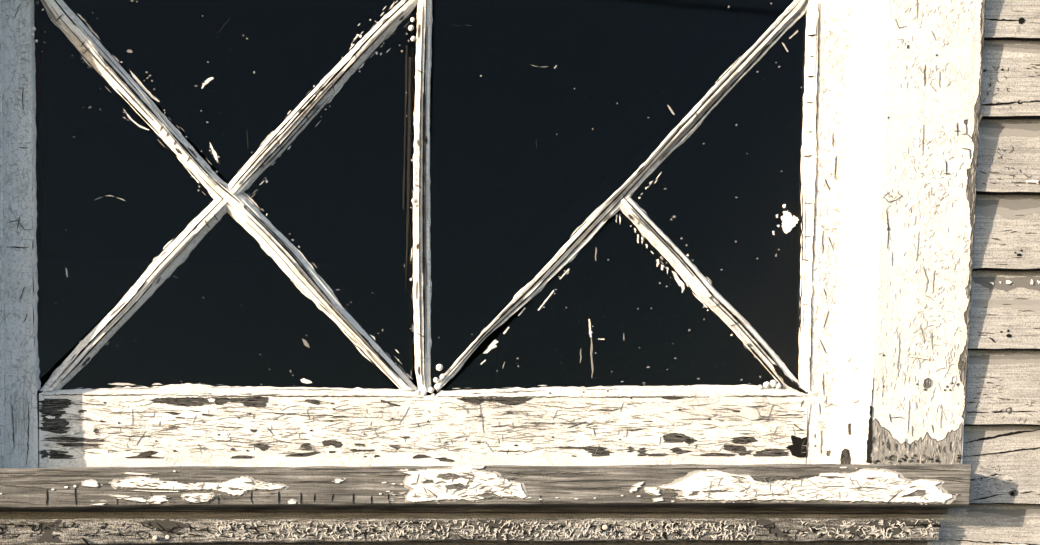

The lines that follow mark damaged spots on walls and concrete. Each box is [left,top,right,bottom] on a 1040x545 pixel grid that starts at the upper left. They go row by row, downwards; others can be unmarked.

crack [6,0,972,464]
peeling [498,162,649,317]
peeling [621,0,1039,505]
peeling [458,391,531,414]
peeling [286,430,380,457]
crack [115,481,277,503]
peeling [379,455,542,504]
crack [415,471,519,499]
crack [694,476,928,503]